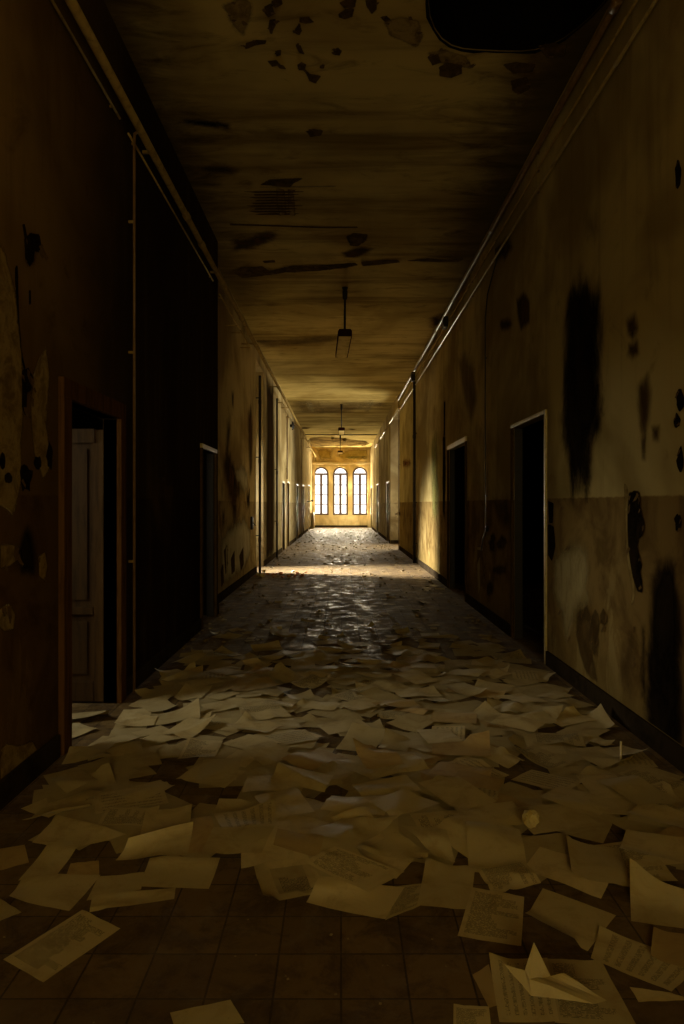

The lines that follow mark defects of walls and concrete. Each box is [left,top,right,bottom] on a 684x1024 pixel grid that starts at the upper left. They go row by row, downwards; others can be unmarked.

spalling [241,0,325,83]
spalling [338,0,390,25]
spalling [428,54,476,78]
peeling [0,247,53,514]
water stain [563,281,603,496]
water stain [642,561,683,744]